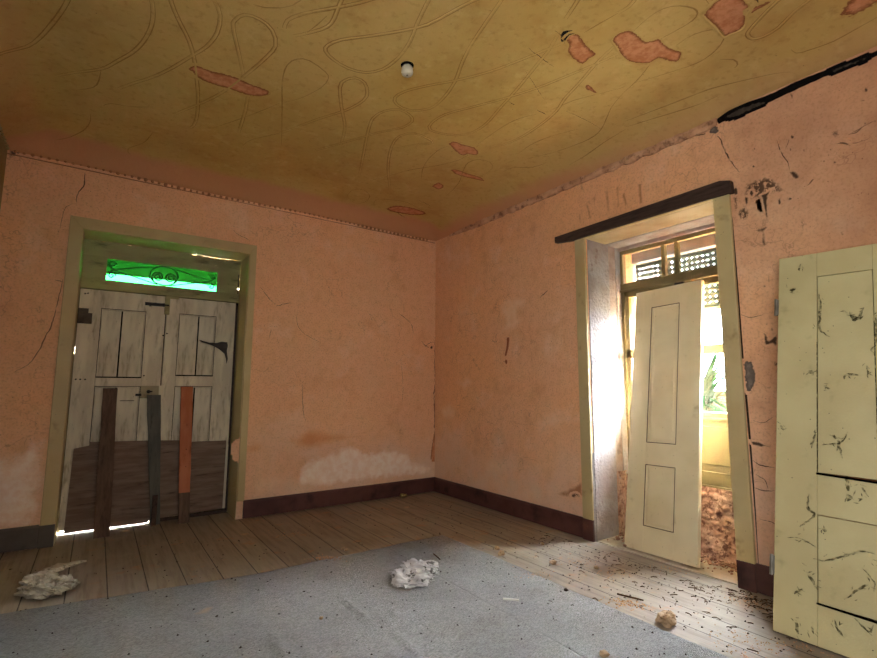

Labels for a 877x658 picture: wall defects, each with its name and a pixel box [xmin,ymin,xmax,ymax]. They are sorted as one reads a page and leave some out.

peeling [698,0,776,39]
peeling [833,0,877,21]
peeling [557,29,600,66]
peeling [608,28,686,66]
peeling [182,63,274,99]
water stain [231,420,435,500]